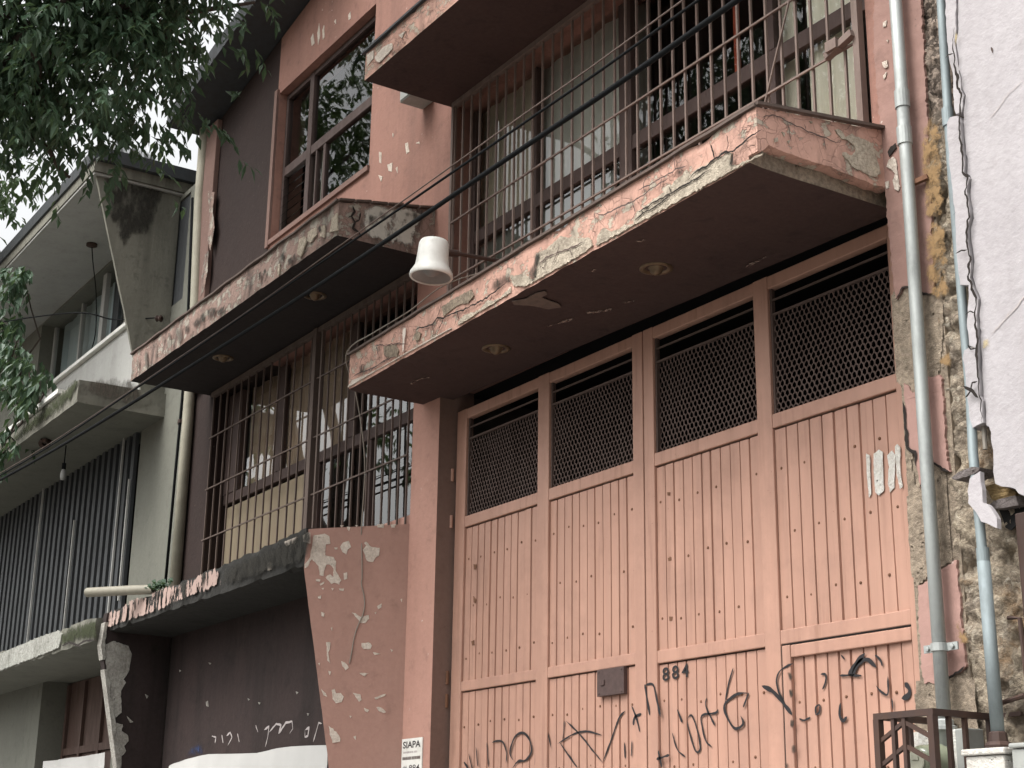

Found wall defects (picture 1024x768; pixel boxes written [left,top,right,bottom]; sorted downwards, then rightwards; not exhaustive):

peeling [311,12,351,45]
peeling [367,31,406,65]
water stain [106,179,161,244]
peeling [200,191,215,298]
peeling [297,213,339,258]
peeling [348,152,764,388]
crack [537,114,840,271]
crack [946,34,982,422]
spalling [999,507,1024,531]
peeling [284,525,380,599]
peeling [97,568,221,768]
peeling [321,689,386,713]